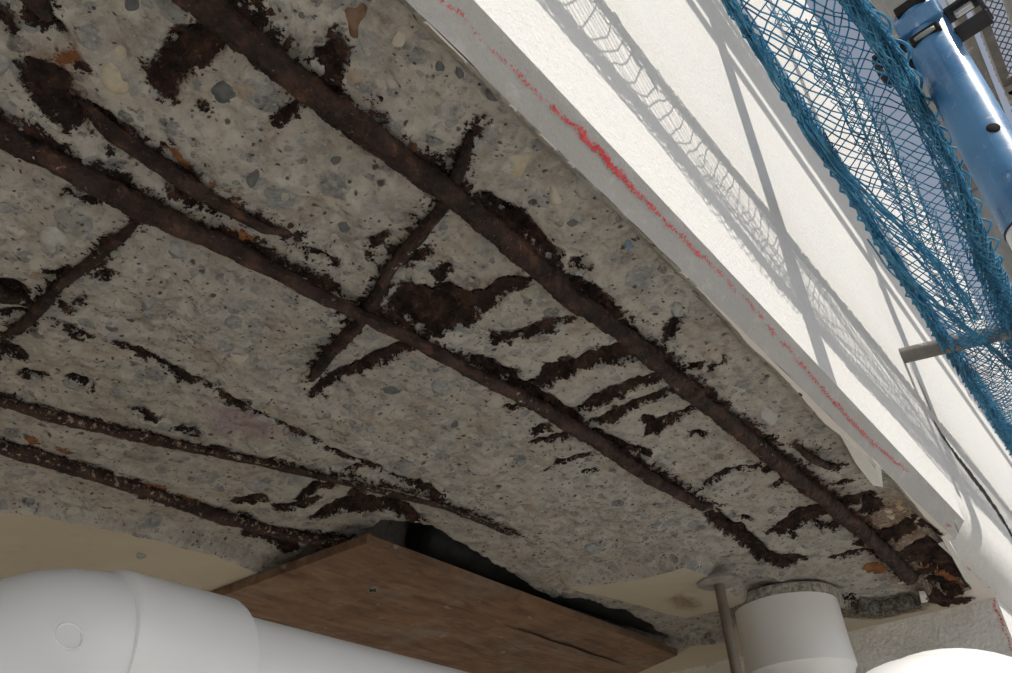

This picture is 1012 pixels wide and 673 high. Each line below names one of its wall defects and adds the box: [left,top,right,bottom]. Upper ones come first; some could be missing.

spalling [0,0,436,305]
corrosion [0,0,841,569]
spalling [0,209,947,654]
spalling [237,0,974,591]
corrosion [393,114,975,607]
corrosion [839,592,859,614]